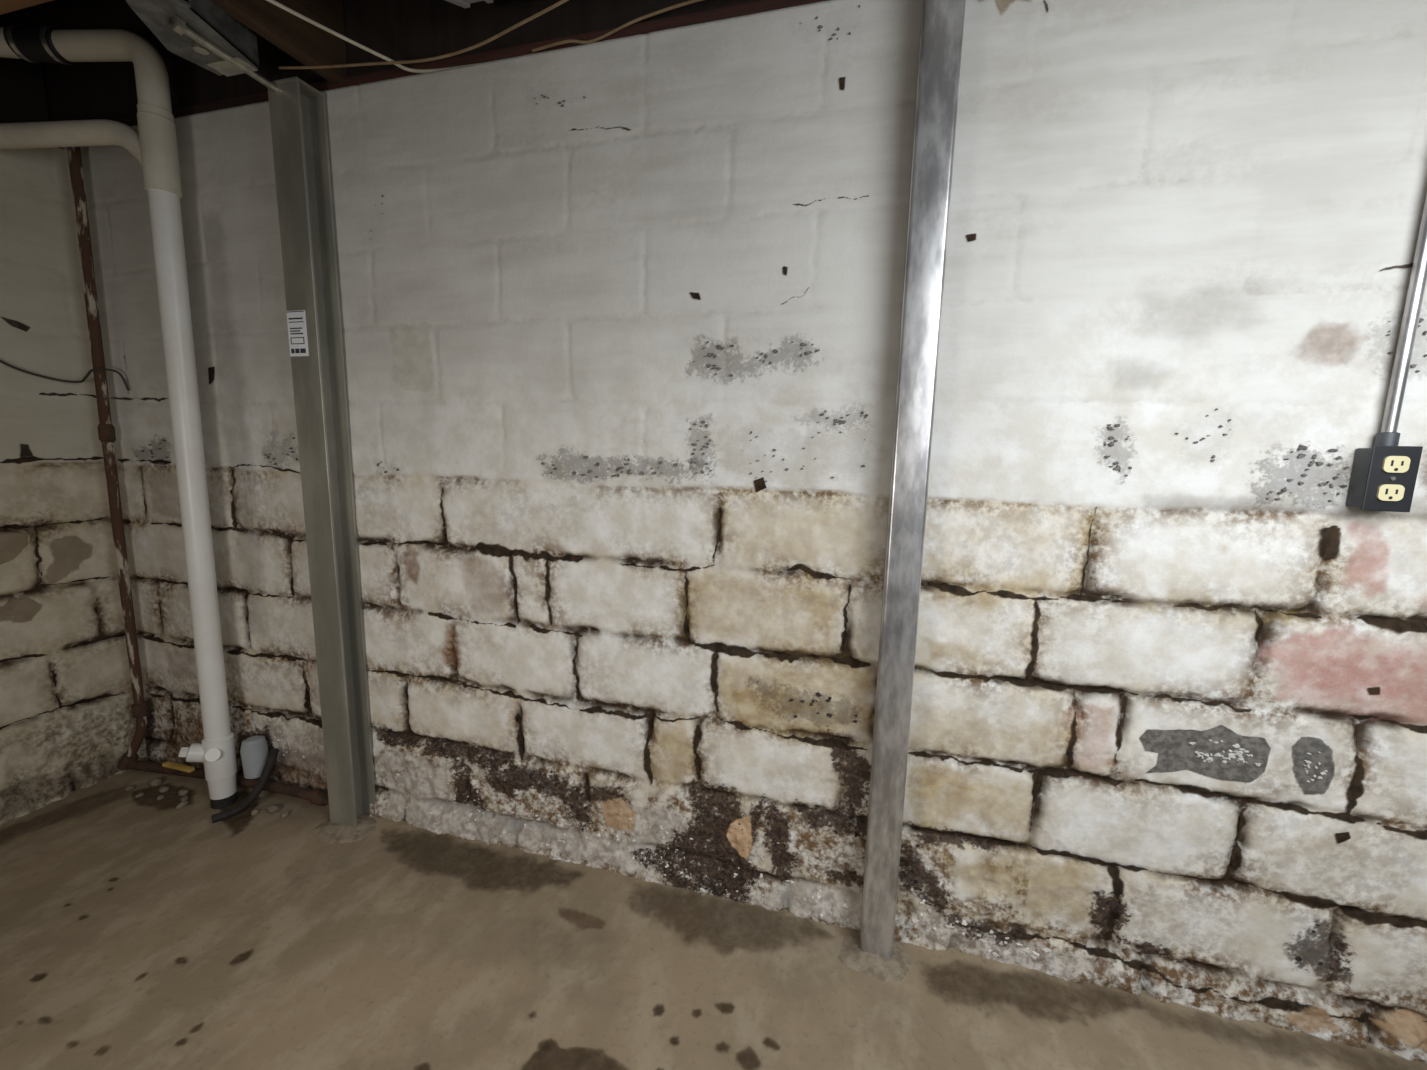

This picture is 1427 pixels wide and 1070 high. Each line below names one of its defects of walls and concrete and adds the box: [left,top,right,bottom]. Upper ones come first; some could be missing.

peeling [996,0,1014,12]
peeling [46,536,91,583]
peeling [0,598,42,622]
damp [133,784,194,809]
damp [221,726,316,833]
damp [370,693,871,918]
peeling [1140,725,1271,782]
peeling [1292,737,1335,795]
damp [899,821,1052,960]
damp [1089,890,1183,964]
damp [1285,920,1353,990]
damp [717,1038,780,1070]